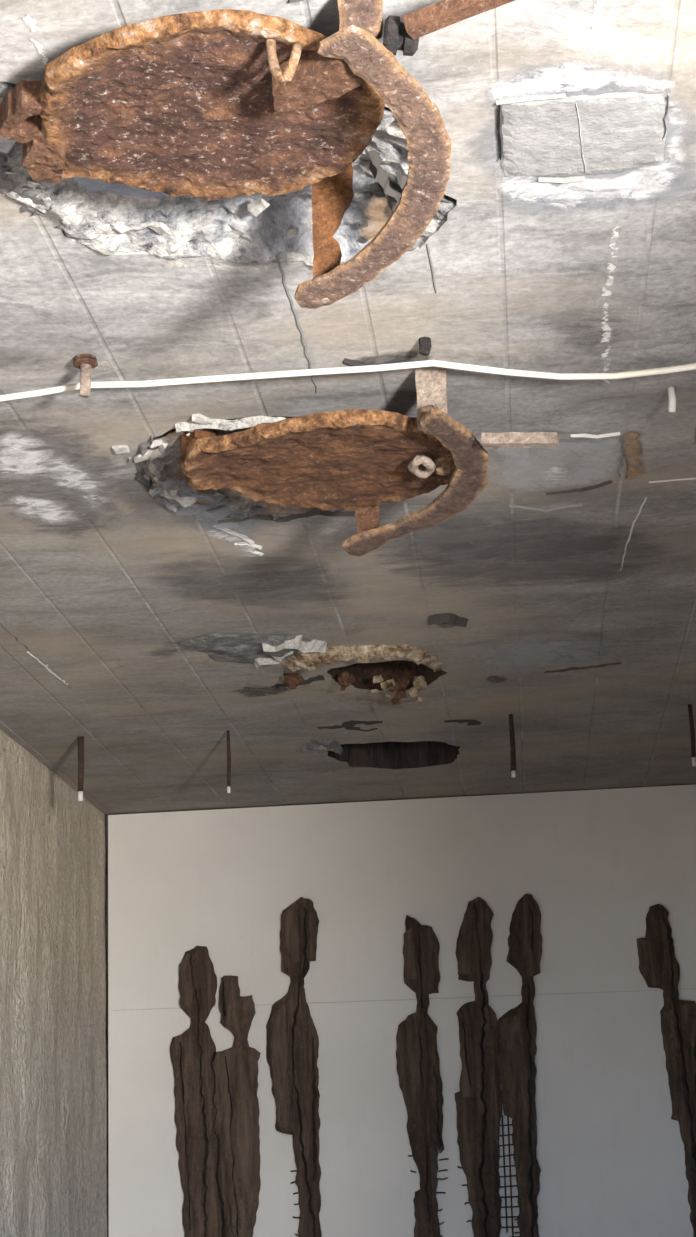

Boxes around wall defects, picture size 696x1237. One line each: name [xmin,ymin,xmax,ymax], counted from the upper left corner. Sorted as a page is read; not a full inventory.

spalling [0,135,314,272]
spalling [333,110,409,265]
spalling [408,198,453,251]
leakage [0,420,129,535]
spalling [112,414,355,534]